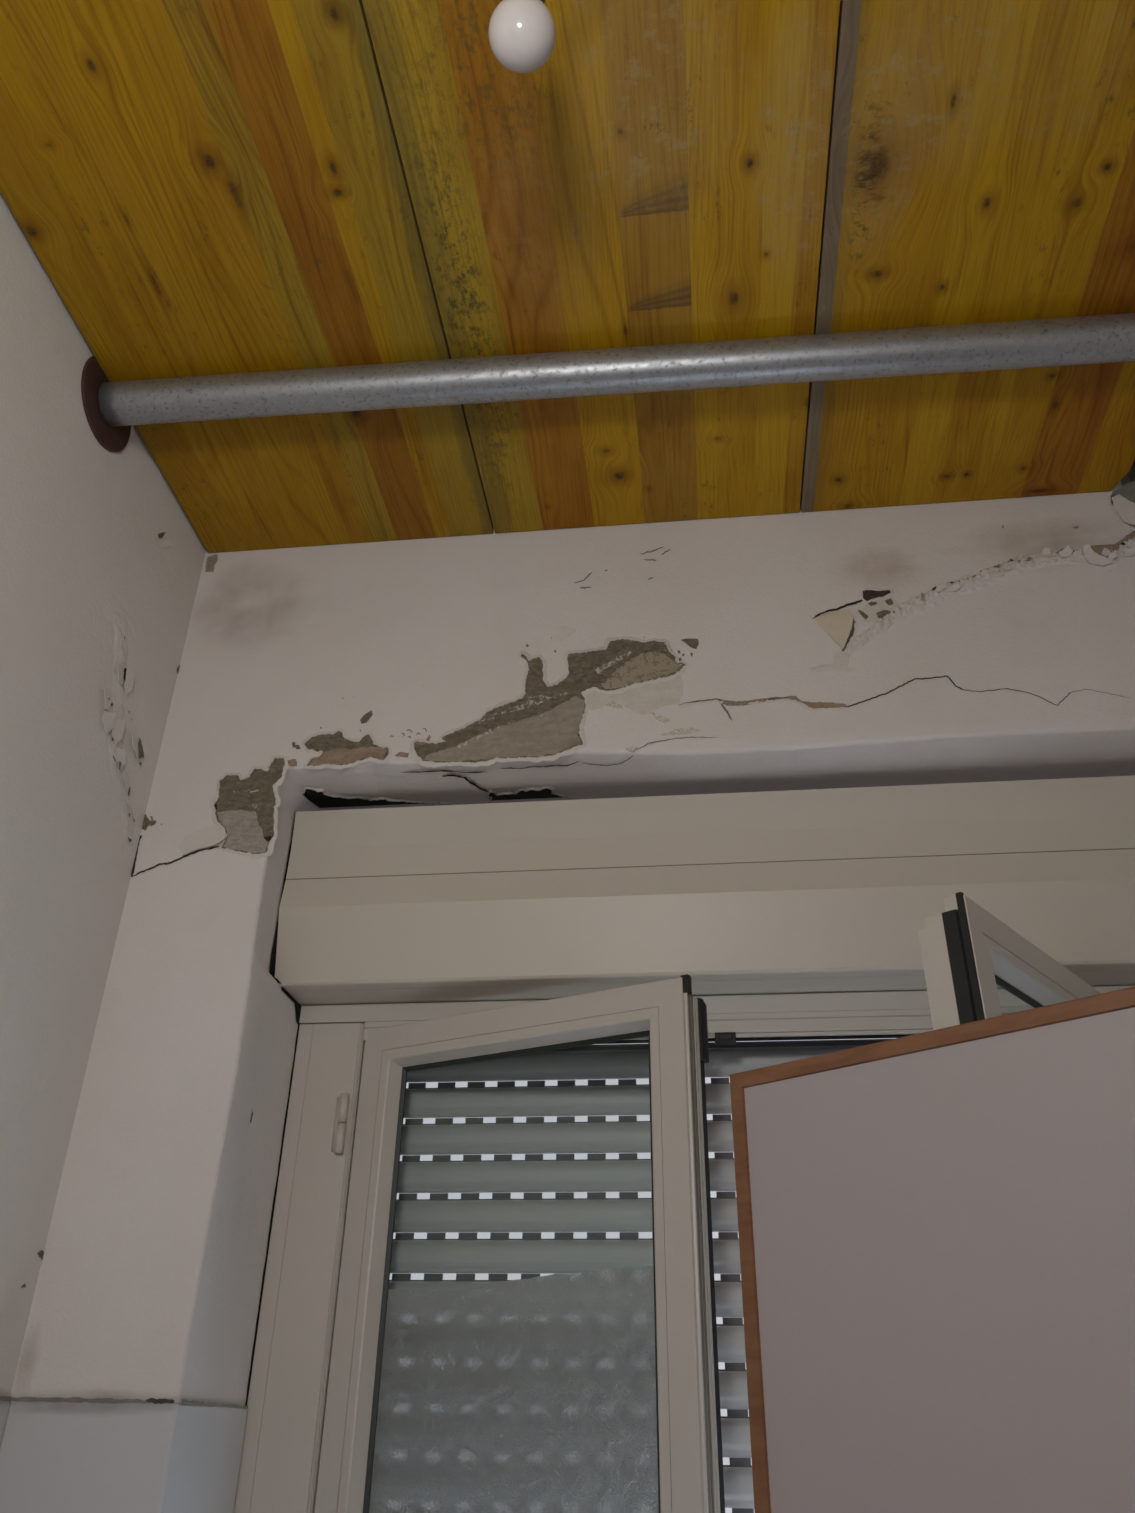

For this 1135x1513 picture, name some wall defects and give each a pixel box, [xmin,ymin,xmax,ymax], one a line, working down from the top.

peeling [1112,459,1135,503]
flaking render [812,588,902,651]
crack [404,675,1129,799]
crack [132,824,226,877]
flaking render [210,636,702,1406]